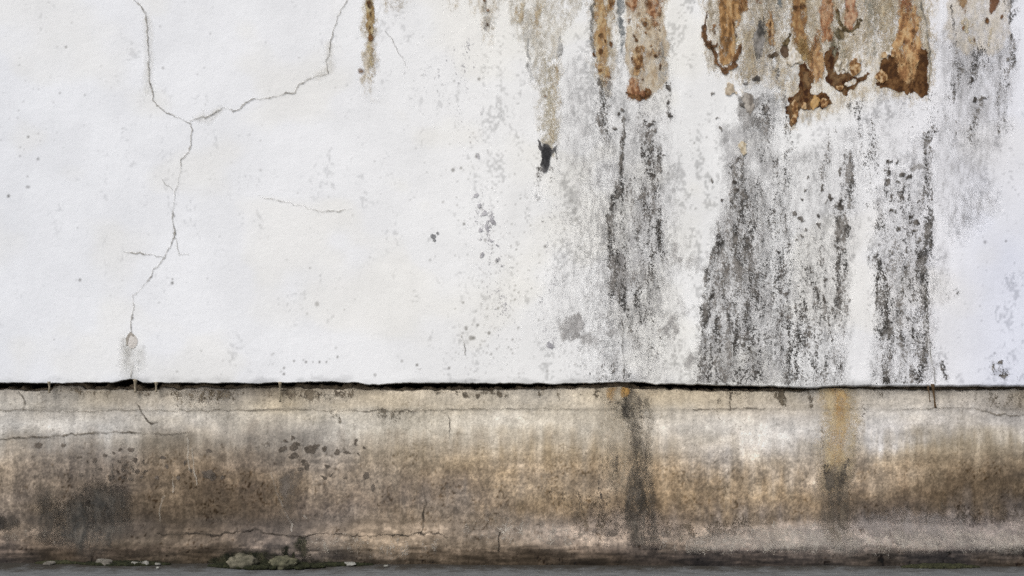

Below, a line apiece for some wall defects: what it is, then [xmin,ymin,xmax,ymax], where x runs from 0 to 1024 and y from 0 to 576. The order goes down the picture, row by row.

rust [359,0,386,83]
rust [469,0,670,157]
rust [701,0,1010,128]
crack [129,0,347,332]
water stain [685,0,1019,418]
water stain [463,78,1024,556]
water stain [164,388,244,407]
water stain [262,388,354,401]
water stain [0,438,225,552]
water stain [209,436,409,563]